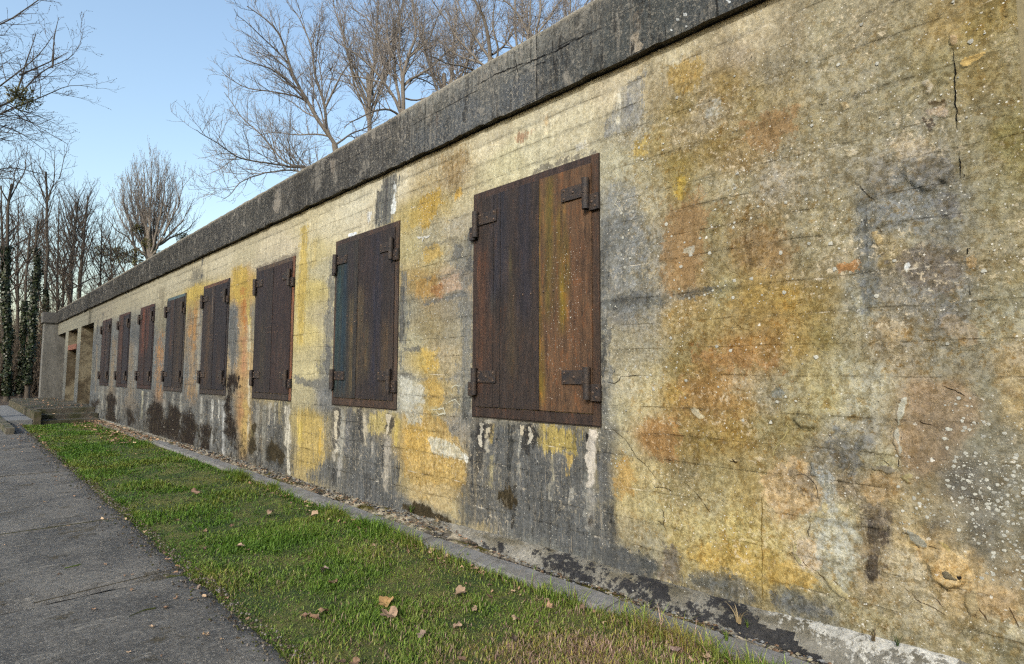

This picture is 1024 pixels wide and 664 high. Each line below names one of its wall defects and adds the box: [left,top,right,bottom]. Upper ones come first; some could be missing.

crack [951,49,959,131]
water stain [118,257,210,431]
water stain [198,0,842,627]
water stain [811,423,901,590]